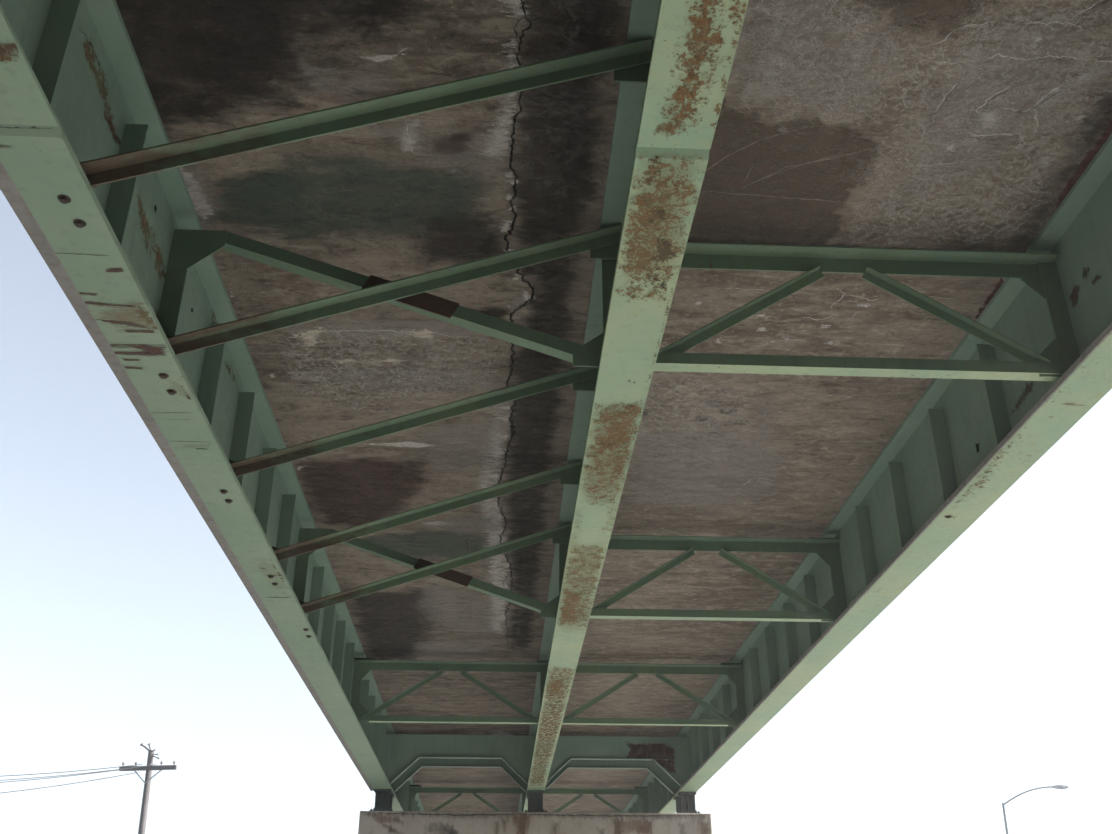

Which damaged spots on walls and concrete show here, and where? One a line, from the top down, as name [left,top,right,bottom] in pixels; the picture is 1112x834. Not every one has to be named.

water stain [116,0,413,124]
water stain [425,76,603,264]
rust [655,0,747,136]
water stain [687,0,1112,252]
crack [912,21,1112,201]
crack [1027,0,1108,27]
crack [497,0,540,644]
water stain [513,348,565,383]
rust [583,156,703,530]
water stain [363,388,562,649]
rust [530,666,576,786]
rust [627,743,676,773]